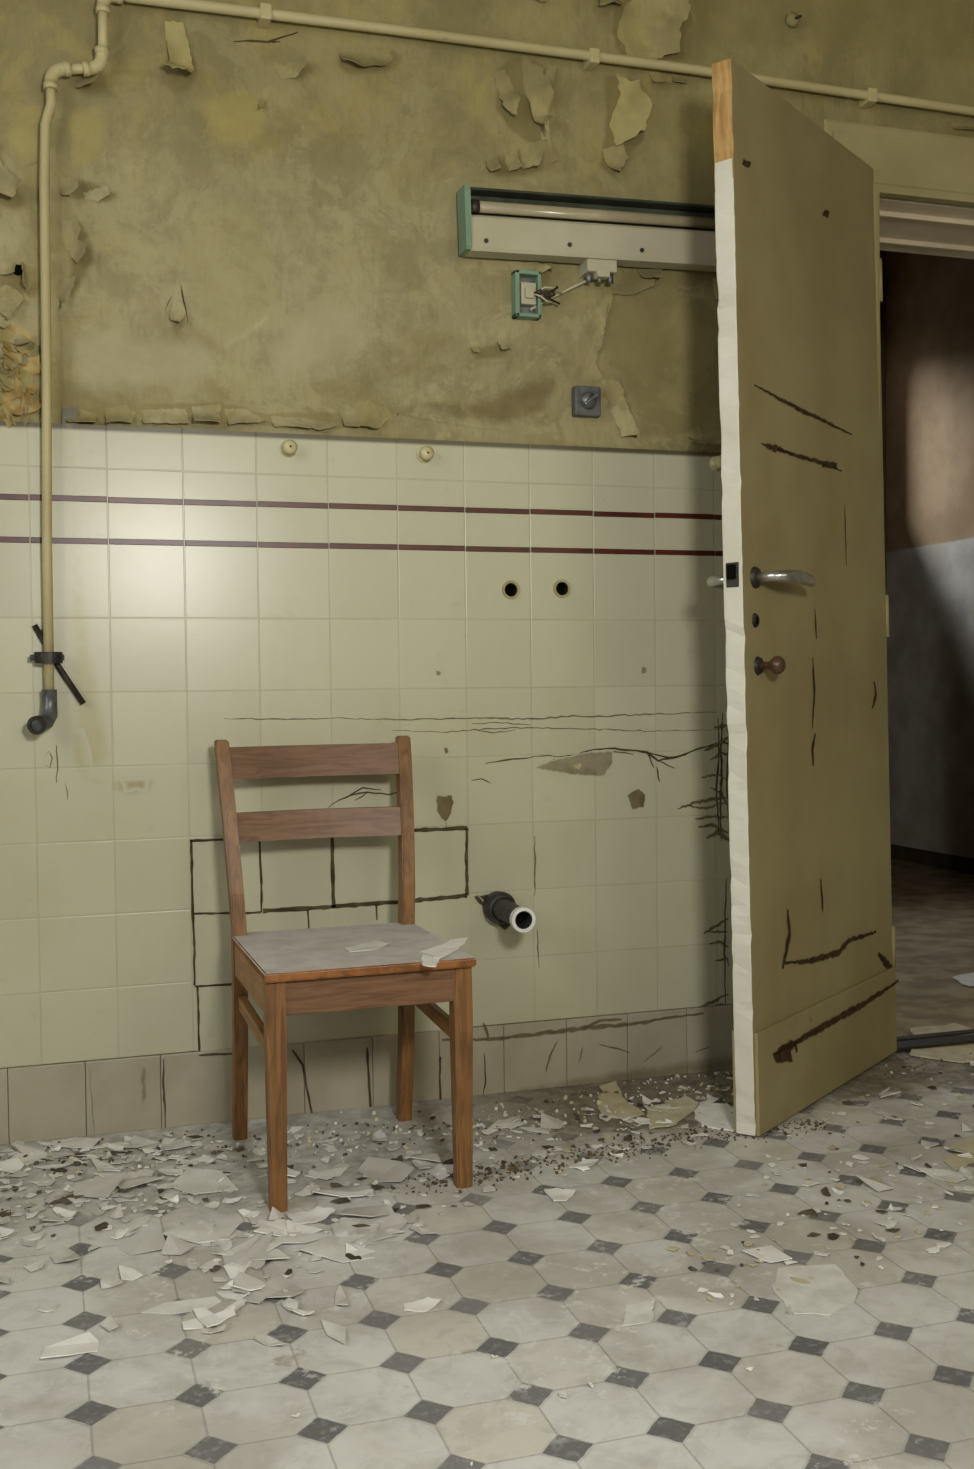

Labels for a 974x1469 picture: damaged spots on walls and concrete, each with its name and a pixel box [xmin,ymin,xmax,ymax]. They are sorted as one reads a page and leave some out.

peeling [596,0,696,63]
peeling [483,52,558,182]
peeling [597,71,653,182]
peeling [0,259,42,428]
peeling [61,399,394,435]
peeling [585,267,721,451]
crack [224,712,729,841]
crack [190,787,469,1056]
crack [531,836,539,896]
crack [439,878,729,1100]
crack [292,1050,313,1113]
crack [365,1047,373,1107]